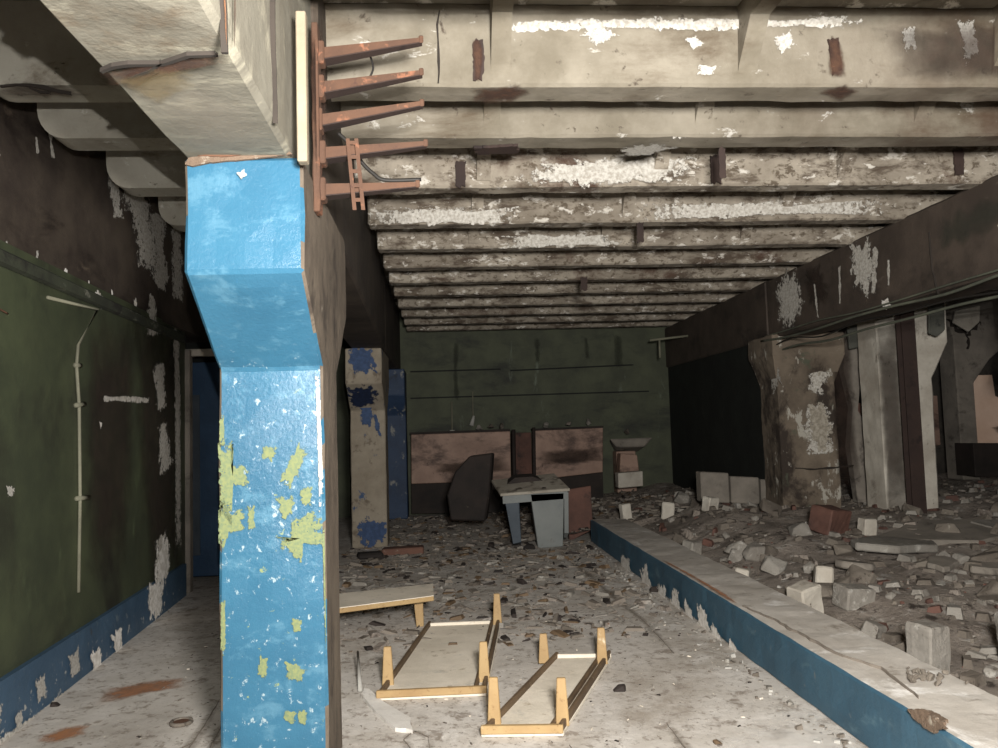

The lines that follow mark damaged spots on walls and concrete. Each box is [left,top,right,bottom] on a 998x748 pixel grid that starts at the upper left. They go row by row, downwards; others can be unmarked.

peeling [512,16,739,50]
peeling [767,16,863,54]
rust [311,33,327,148]
rust [472,38,527,102]
rust [823,37,855,99]
peeling [520,137,722,189]
peeling [368,206,519,226]
peeling [501,233,622,249]
peeling [636,200,882,243]
peeling [147,328,182,627]
peeling [218,415,255,550]
peeling [275,376,326,628]